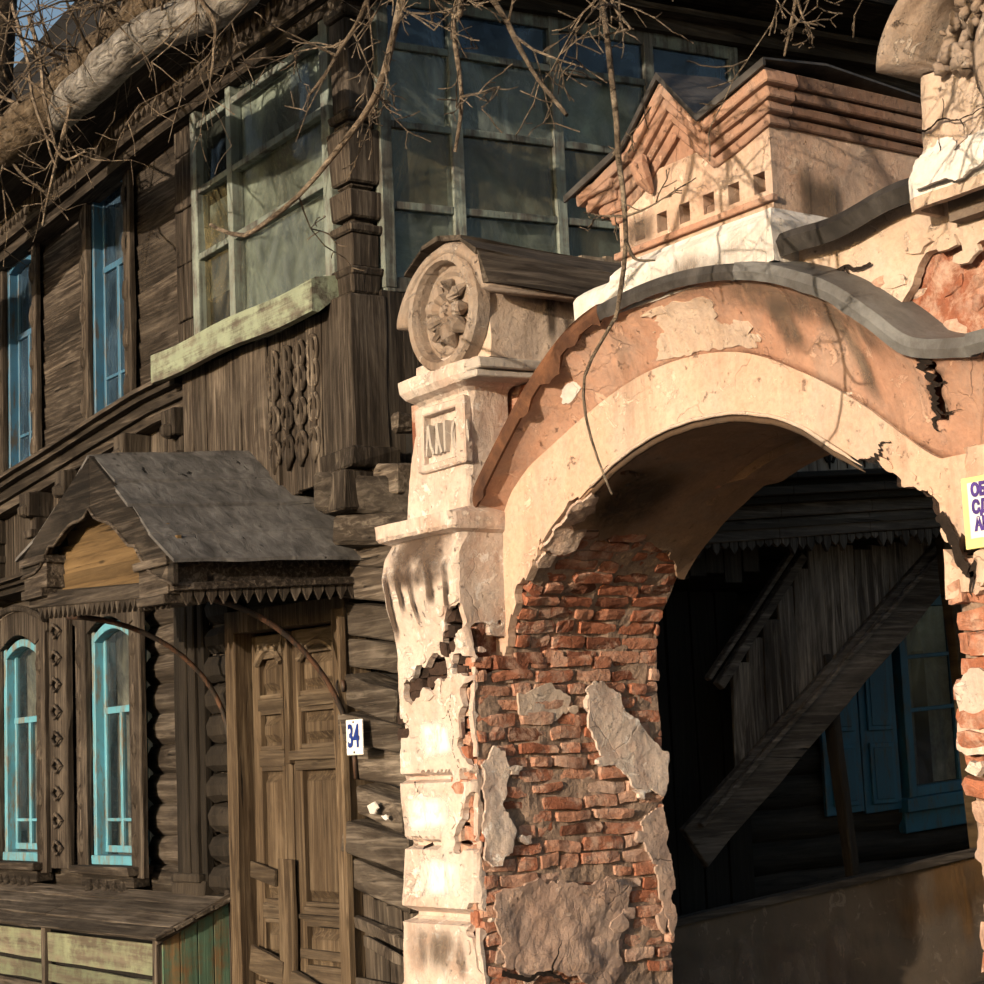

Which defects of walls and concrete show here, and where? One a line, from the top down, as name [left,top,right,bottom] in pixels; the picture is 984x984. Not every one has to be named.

crack [917,98,984,151]
flaking render [905,234,984,312]
flaking render [640,297,762,361]
flaking render [943,319,967,333]
crack [915,358,962,432]
flaking render [401,594,532,867]
flaking render [954,668,984,776]
flaking render [517,681,677,937]
flaking render [975,825,984,876]
crack [502,941,570,984]
flaking render [462,876,632,984]
rust [934,857,984,932]